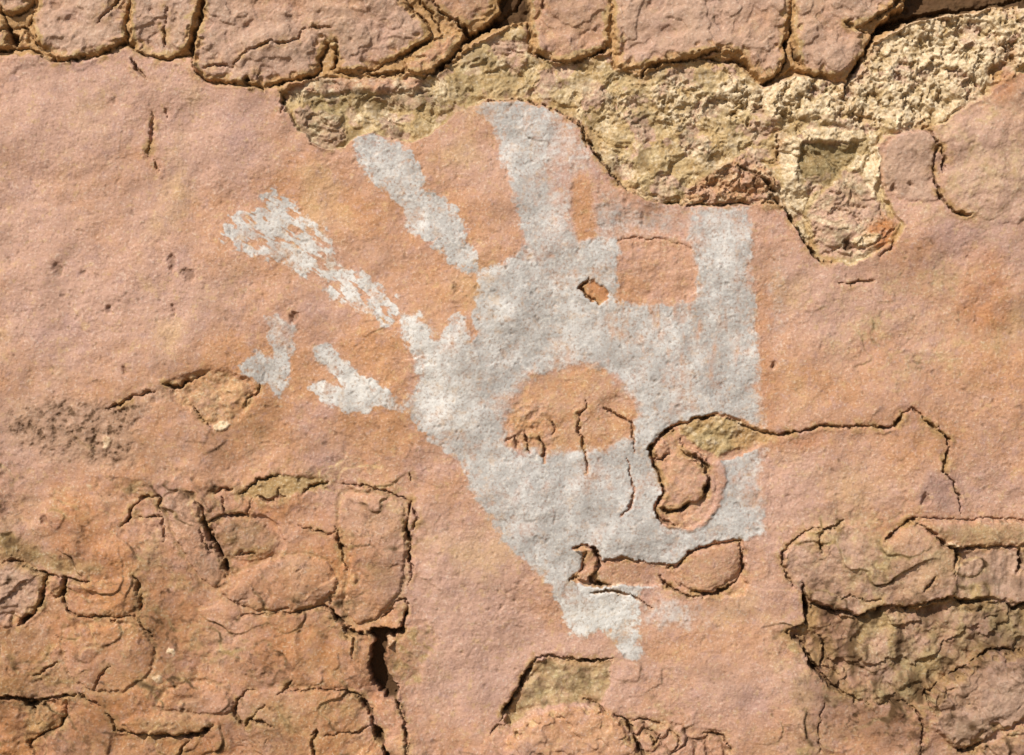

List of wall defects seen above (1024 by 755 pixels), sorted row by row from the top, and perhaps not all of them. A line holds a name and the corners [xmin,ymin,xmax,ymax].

crack [0,0,610,114]
crack [640,23,802,88]
spalling [280,6,1024,267]
spalling [170,368,259,431]
crack [0,558,157,654]
crack [120,494,168,543]
crack [0,662,411,755]
crack [197,473,421,657]
spalling [504,657,614,729]
spalling [648,412,769,531]
crack [489,401,1024,755]
spalling [789,599,1024,710]